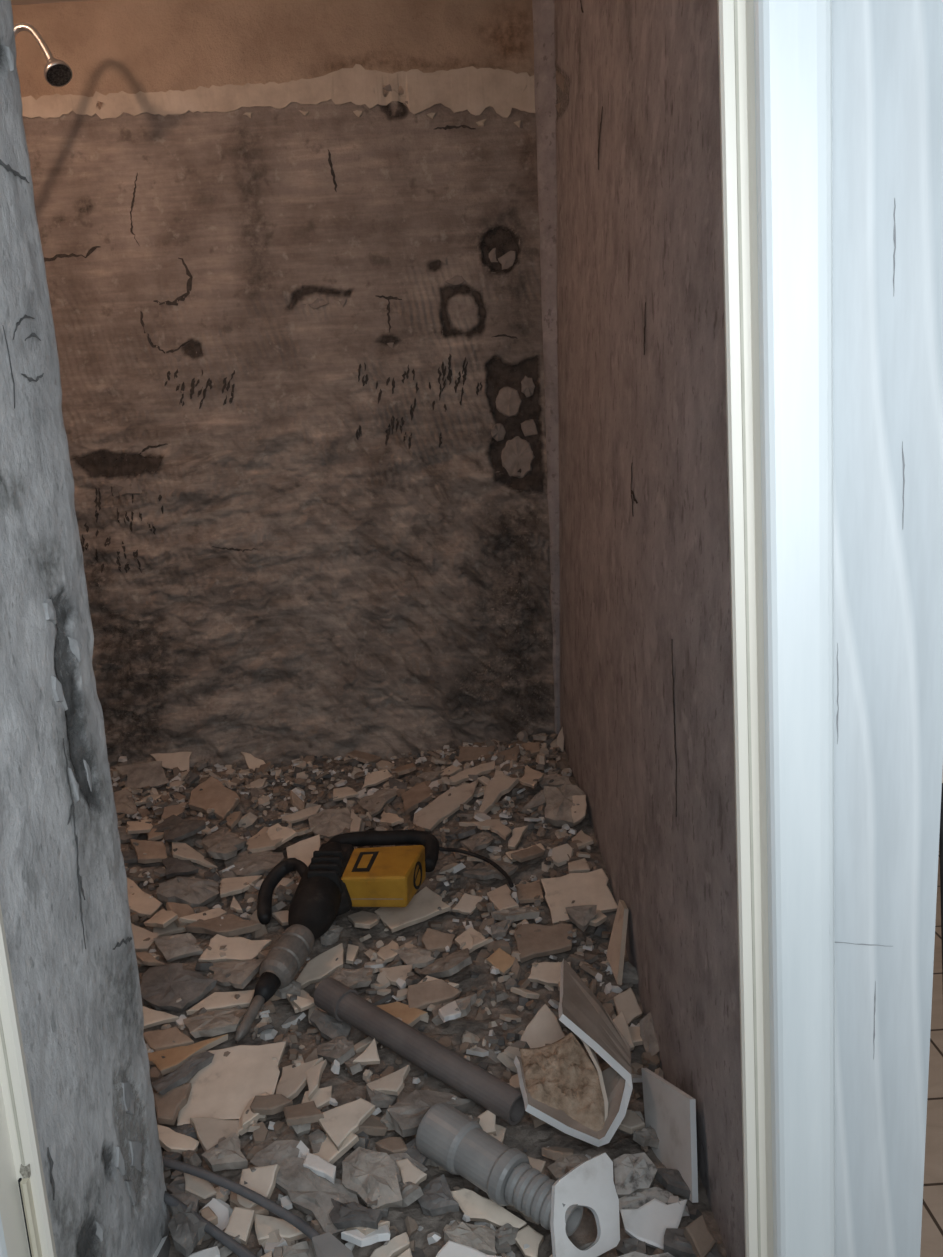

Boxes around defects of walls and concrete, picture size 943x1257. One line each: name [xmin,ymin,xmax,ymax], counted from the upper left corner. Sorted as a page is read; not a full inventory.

spalling [0,42,14,71]
flaking render [21,64,536,128]
crack [0,159,30,183]
crack [130,173,139,244]
crack [44,246,100,262]
spalling [480,226,520,273]
crack [140,258,193,354]
spalling [428,257,486,337]
crack [2,315,44,409]
spalling [358,354,544,494]
spalling [74,449,163,573]
water stain [101,611,179,757]